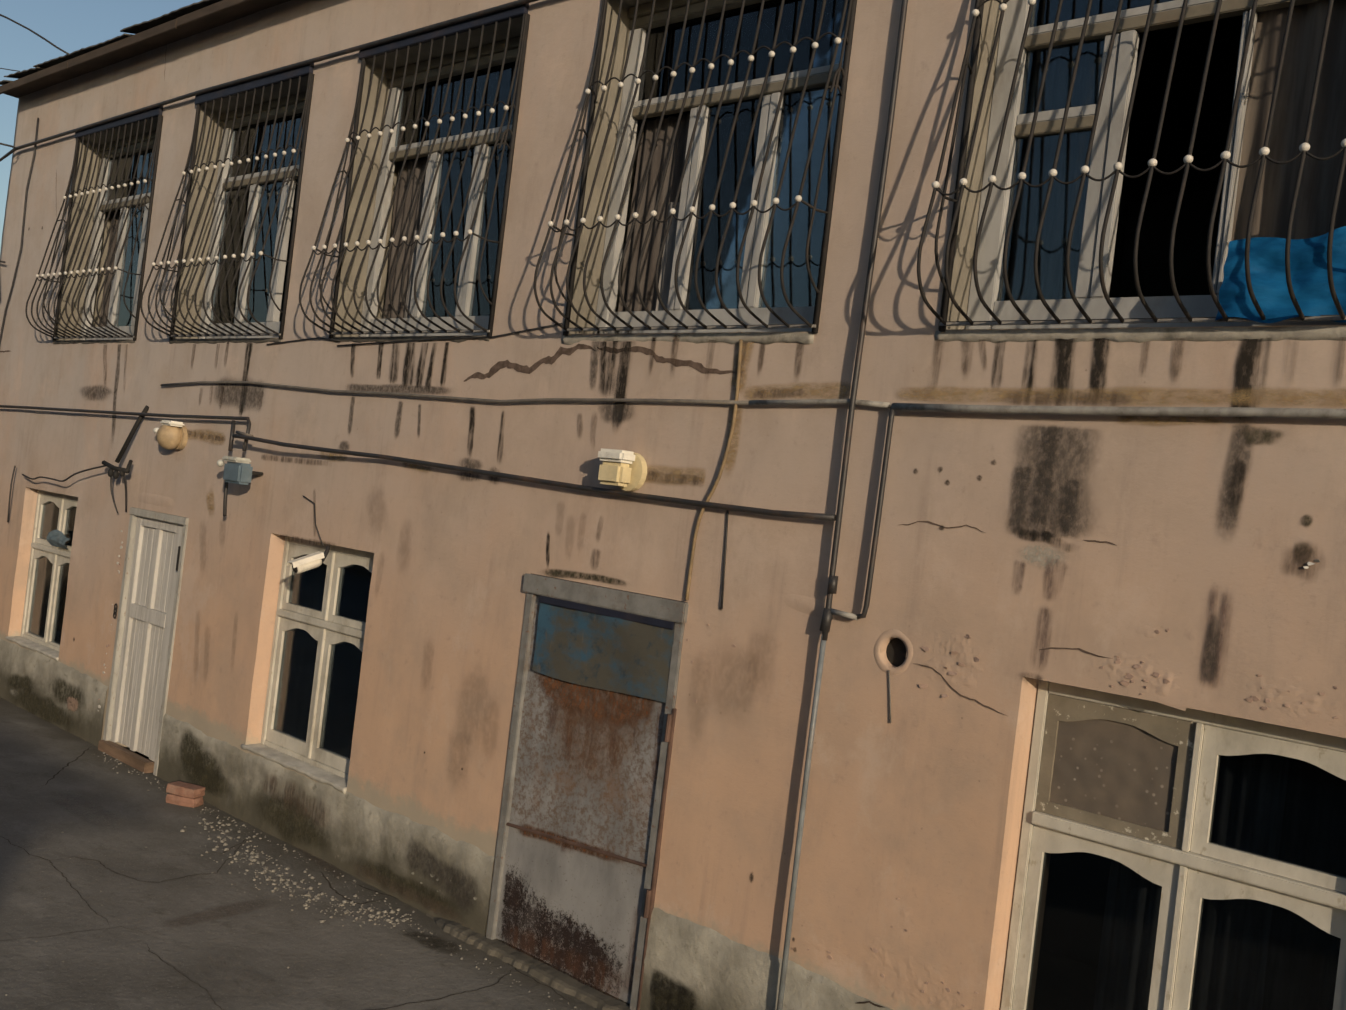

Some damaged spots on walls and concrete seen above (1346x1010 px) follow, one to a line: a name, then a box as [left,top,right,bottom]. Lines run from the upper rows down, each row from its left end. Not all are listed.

damp [1016,338,1074,404]
damp [1084,338,1117,404]
damp [1221,338,1281,525]
damp [1010,427,1087,588]
rust [540,674,653,748]
peeling [916,627,985,698]
peeling [1090,651,1186,711]
rust [520,825,613,860]
crack [0,836,249,1010]
crack [320,871,399,904]
rust [498,867,634,998]
crack [370,963,572,1010]